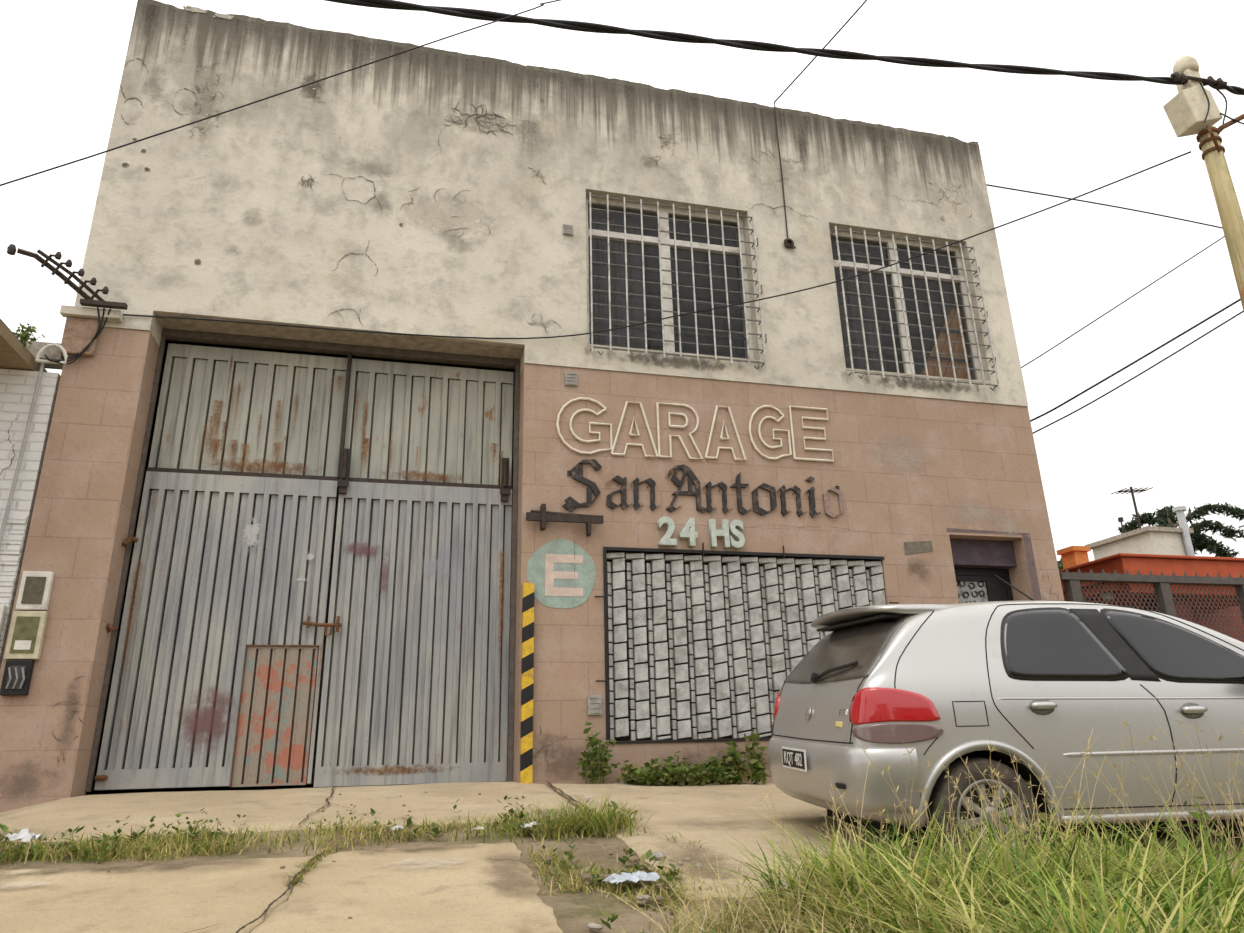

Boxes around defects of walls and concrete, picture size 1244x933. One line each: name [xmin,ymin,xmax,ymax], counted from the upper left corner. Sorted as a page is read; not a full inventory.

crack [302,174,382,211]
corrosion [204,357,306,473]
corrosion [355,393,369,459]